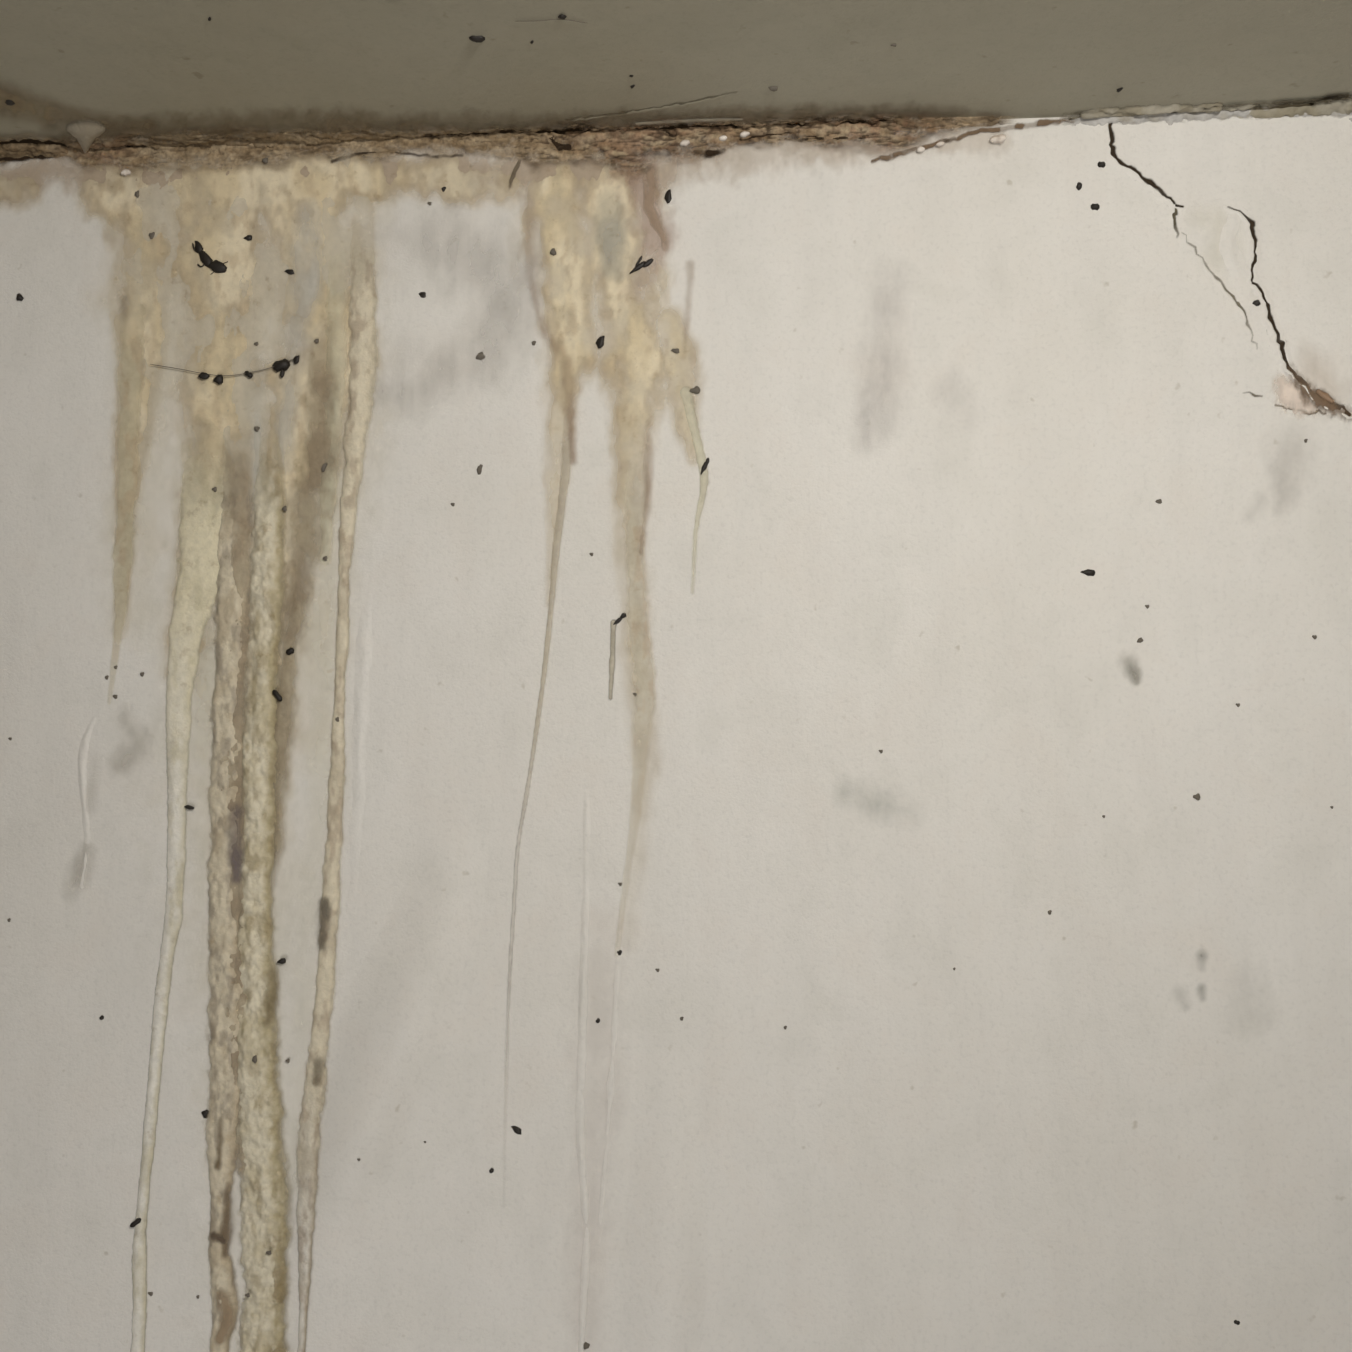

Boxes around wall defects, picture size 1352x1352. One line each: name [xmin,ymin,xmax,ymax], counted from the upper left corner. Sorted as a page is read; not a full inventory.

water stain [81,152,708,1352]
crack [1068,95,1352,430]